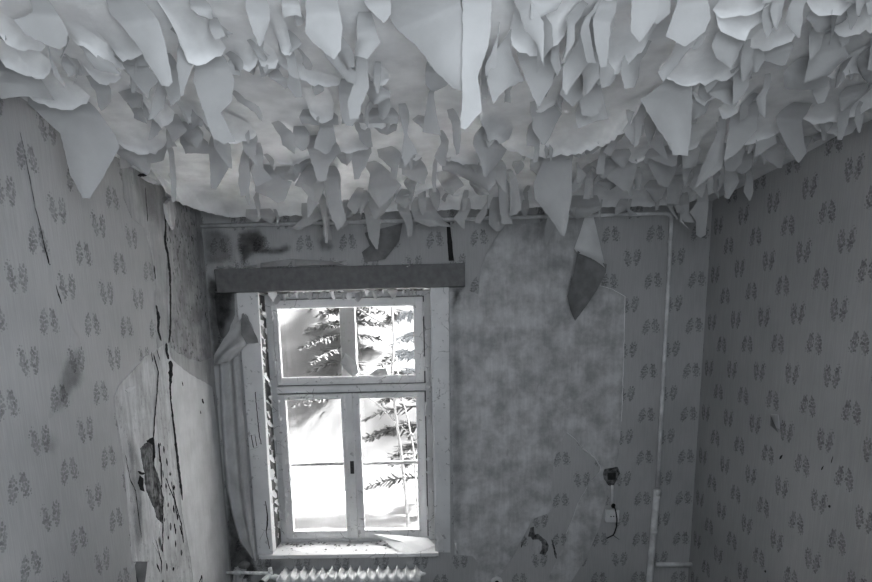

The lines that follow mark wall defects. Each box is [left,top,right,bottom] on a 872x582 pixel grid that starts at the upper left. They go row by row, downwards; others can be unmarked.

crack [125,188,184,572]
flaking render [138,437,183,556]
peeling [0,0,872,384]
flaking render [521,527,557,559]